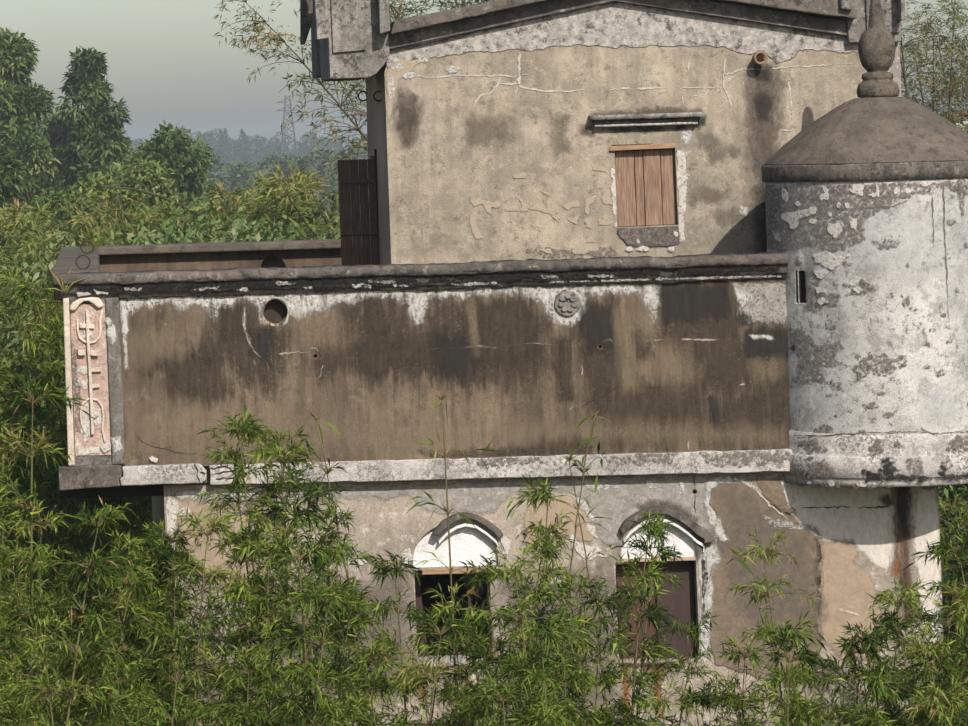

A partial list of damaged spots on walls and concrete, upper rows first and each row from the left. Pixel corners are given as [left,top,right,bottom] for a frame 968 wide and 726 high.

leakage [396,93,420,146]
peeling [386,2,858,71]
crack [407,52,856,131]
leakage [595,66,781,252]
peeling [765,179,968,313]
crack [836,182,908,210]
crack [932,187,949,314]
leakage [78,263,835,479]
leakage [861,435,968,484]
peeling [166,473,897,683]
rust [880,487,914,621]
peeling [909,486,943,663]